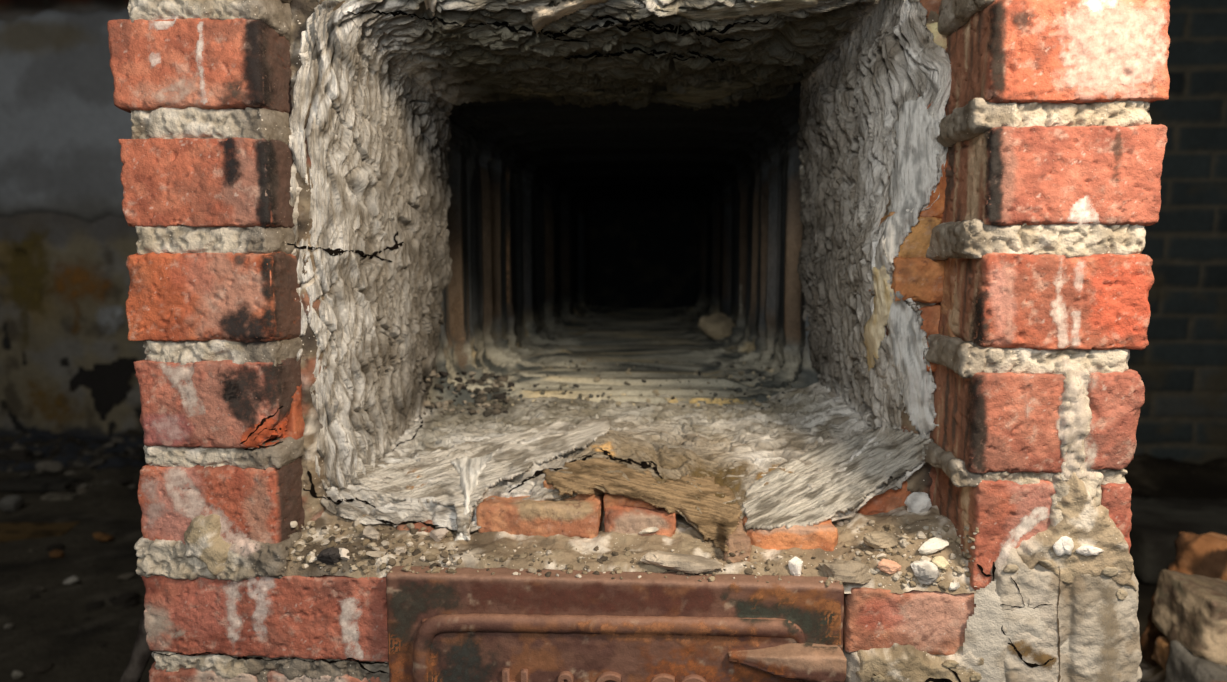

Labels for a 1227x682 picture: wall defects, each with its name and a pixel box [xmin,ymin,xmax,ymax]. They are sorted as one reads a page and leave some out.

leakage [1060,0,1167,98]
crack [287,232,406,262]
spalling [60,358,141,435]
spalling [240,406,287,451]
crack [303,471,448,530]
crack [509,449,663,493]
leakage [225,576,274,641]
leakage [340,598,363,659]
rust [389,634,411,682]
rust [577,620,800,682]
rust [730,584,841,645]
crack [977,562,1061,682]